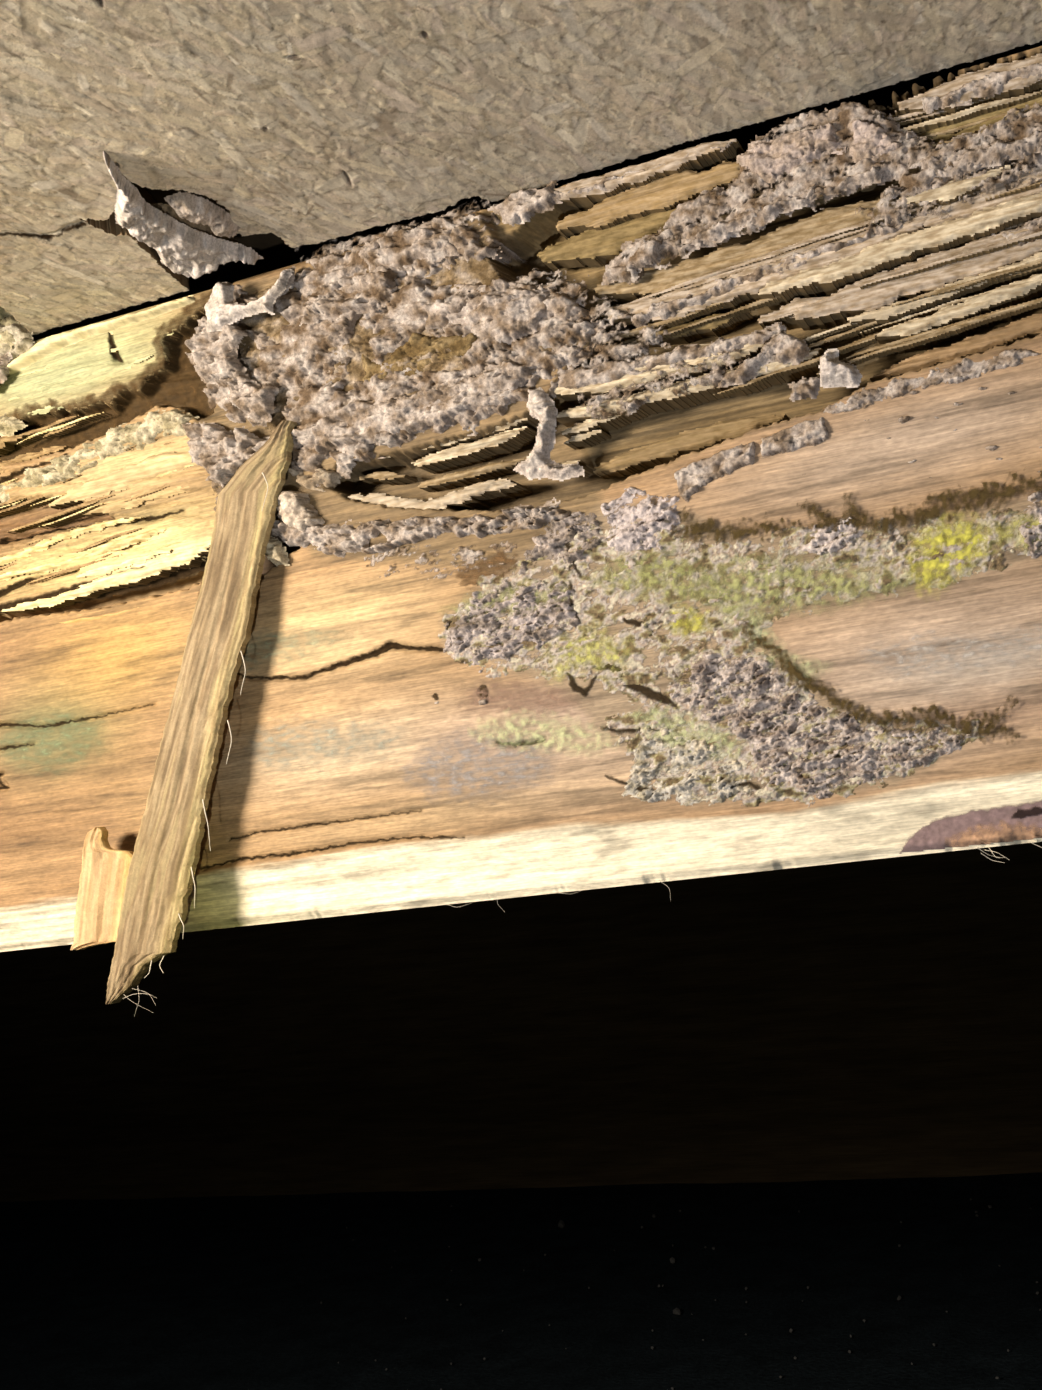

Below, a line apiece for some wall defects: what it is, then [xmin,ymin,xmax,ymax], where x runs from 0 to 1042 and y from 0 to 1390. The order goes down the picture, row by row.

crack [0,222,86,241]
crack [0,453,67,503]
crack [0,526,87,544]
crack [128,510,184,524]
crack [0,548,209,613]
damp [438,471,1042,807]